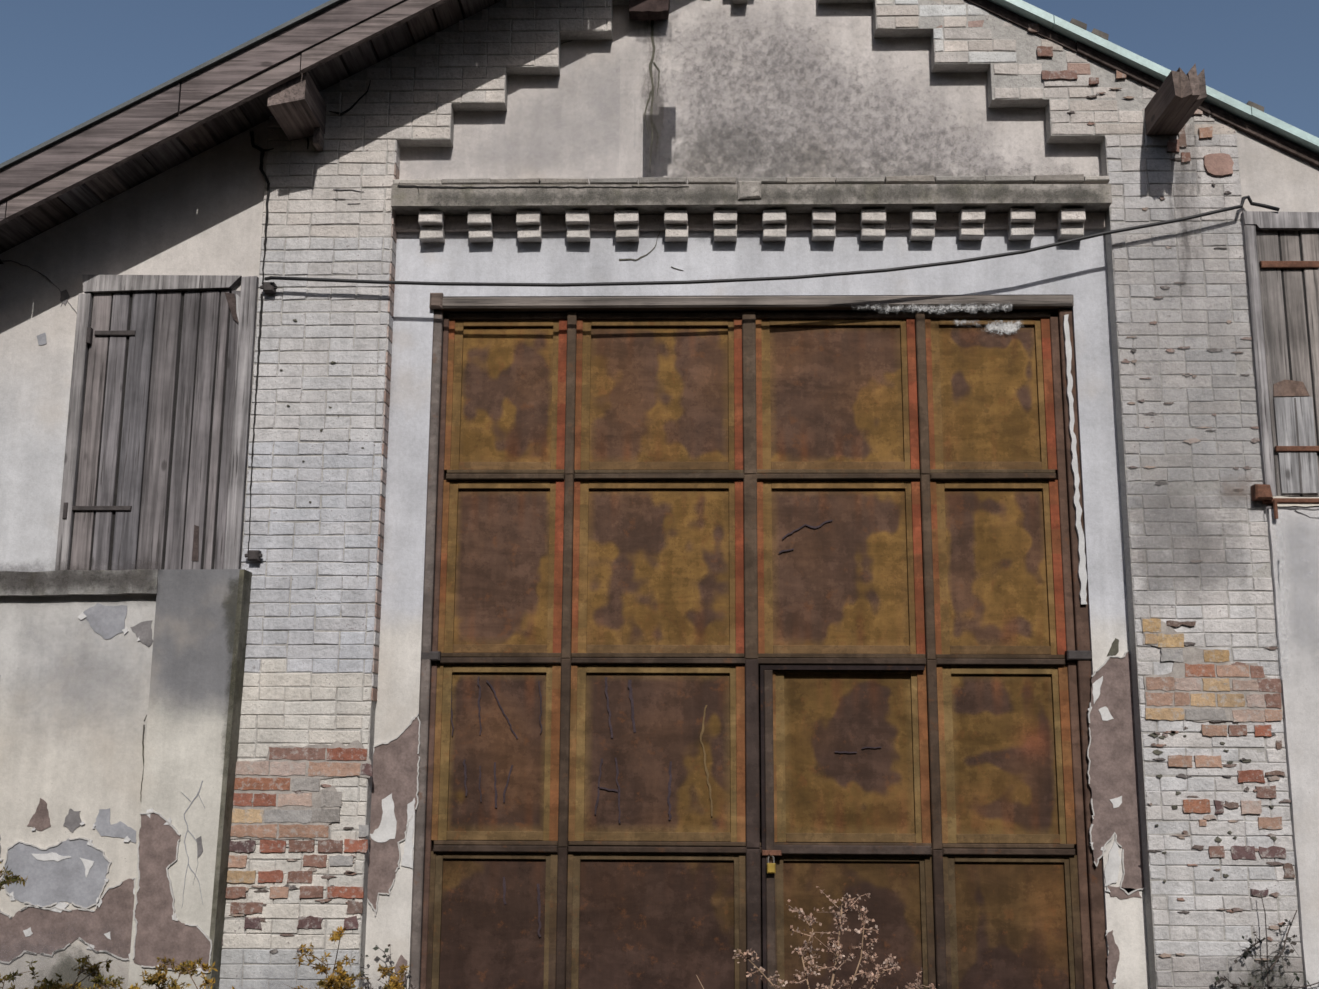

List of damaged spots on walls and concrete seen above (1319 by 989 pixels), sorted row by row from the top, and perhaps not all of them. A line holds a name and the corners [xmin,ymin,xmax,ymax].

flaking render [1028,23,1134,99]
crack [397,20,689,192]
flaking render [1167,109,1234,194]
crack [333,189,364,205]
peeling [78,603,153,647]
peeling [1087,617,1295,899]
flaking render [225,713,421,954]
peeling [0,798,223,975]
peeling [1105,930,1120,989]